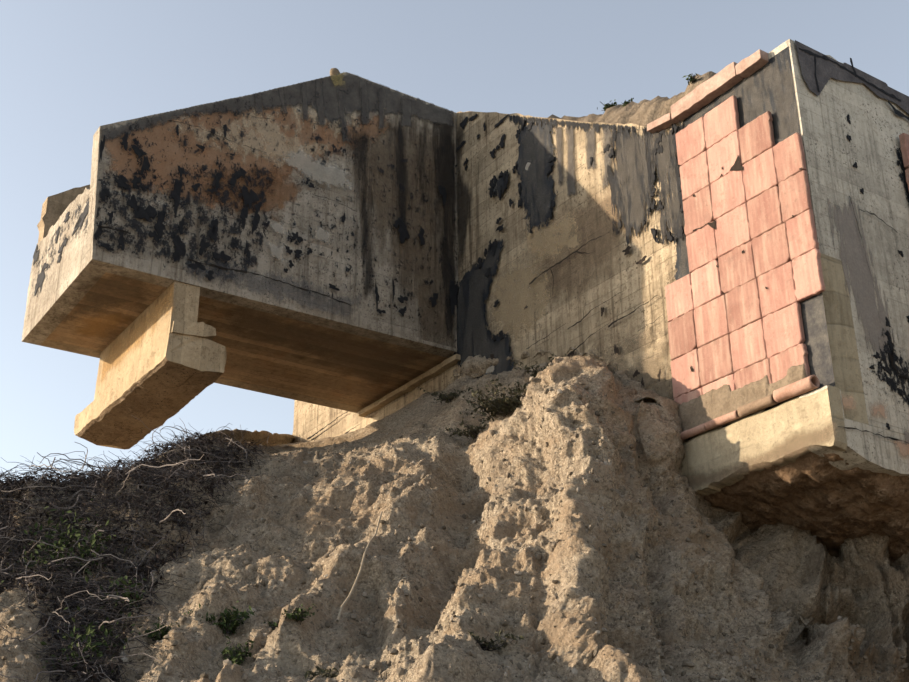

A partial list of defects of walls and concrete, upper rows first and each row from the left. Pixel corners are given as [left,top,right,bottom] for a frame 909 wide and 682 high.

rust [104,107,395,219]
water stain [101,73,652,344]
crack [529,232,610,293]
spalling [820,253,894,425]
spalling [687,427,832,486]